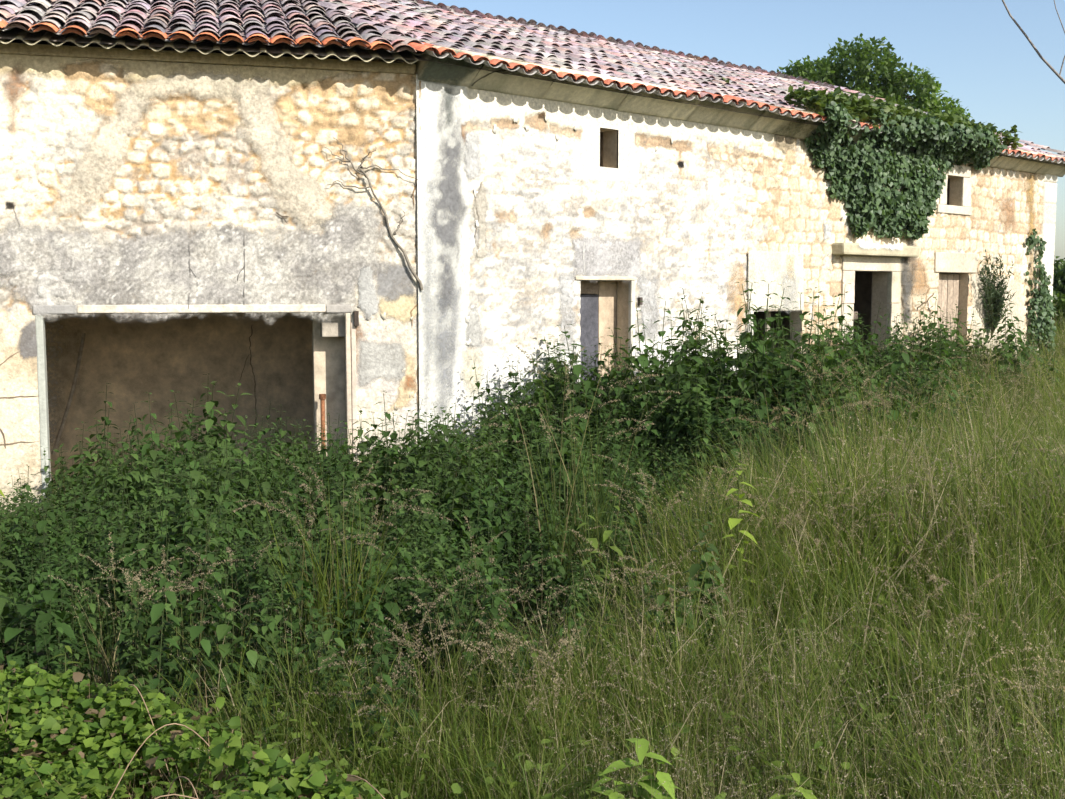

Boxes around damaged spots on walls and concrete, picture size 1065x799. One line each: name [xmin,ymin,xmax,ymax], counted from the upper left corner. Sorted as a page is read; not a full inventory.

spalling [137,94,244,137]
spalling [274,61,421,147]
spalling [707,134,795,181]
leakage [377,90,466,411]